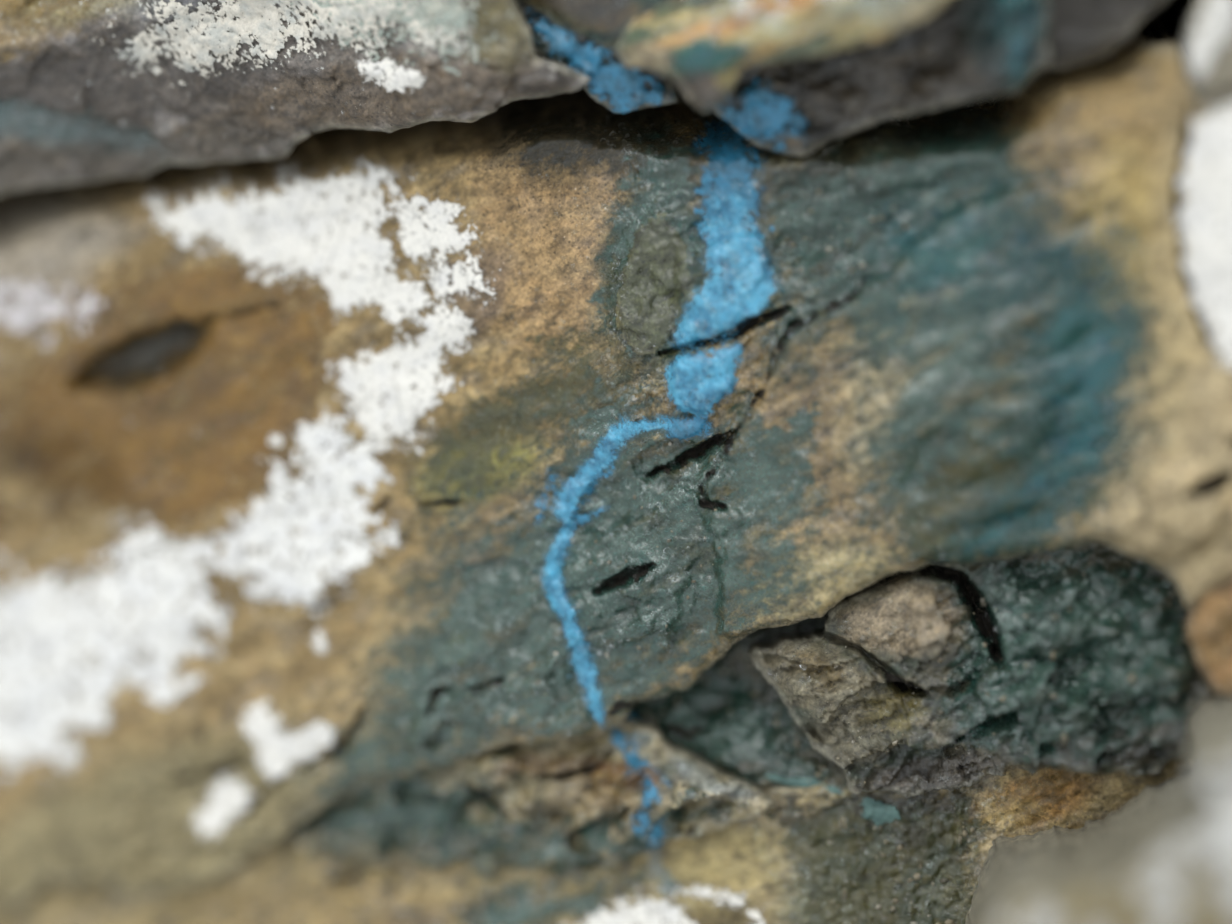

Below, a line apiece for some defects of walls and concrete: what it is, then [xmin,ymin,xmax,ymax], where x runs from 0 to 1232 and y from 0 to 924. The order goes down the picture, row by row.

crack [651,278,865,510]
crack [594,562,656,596]